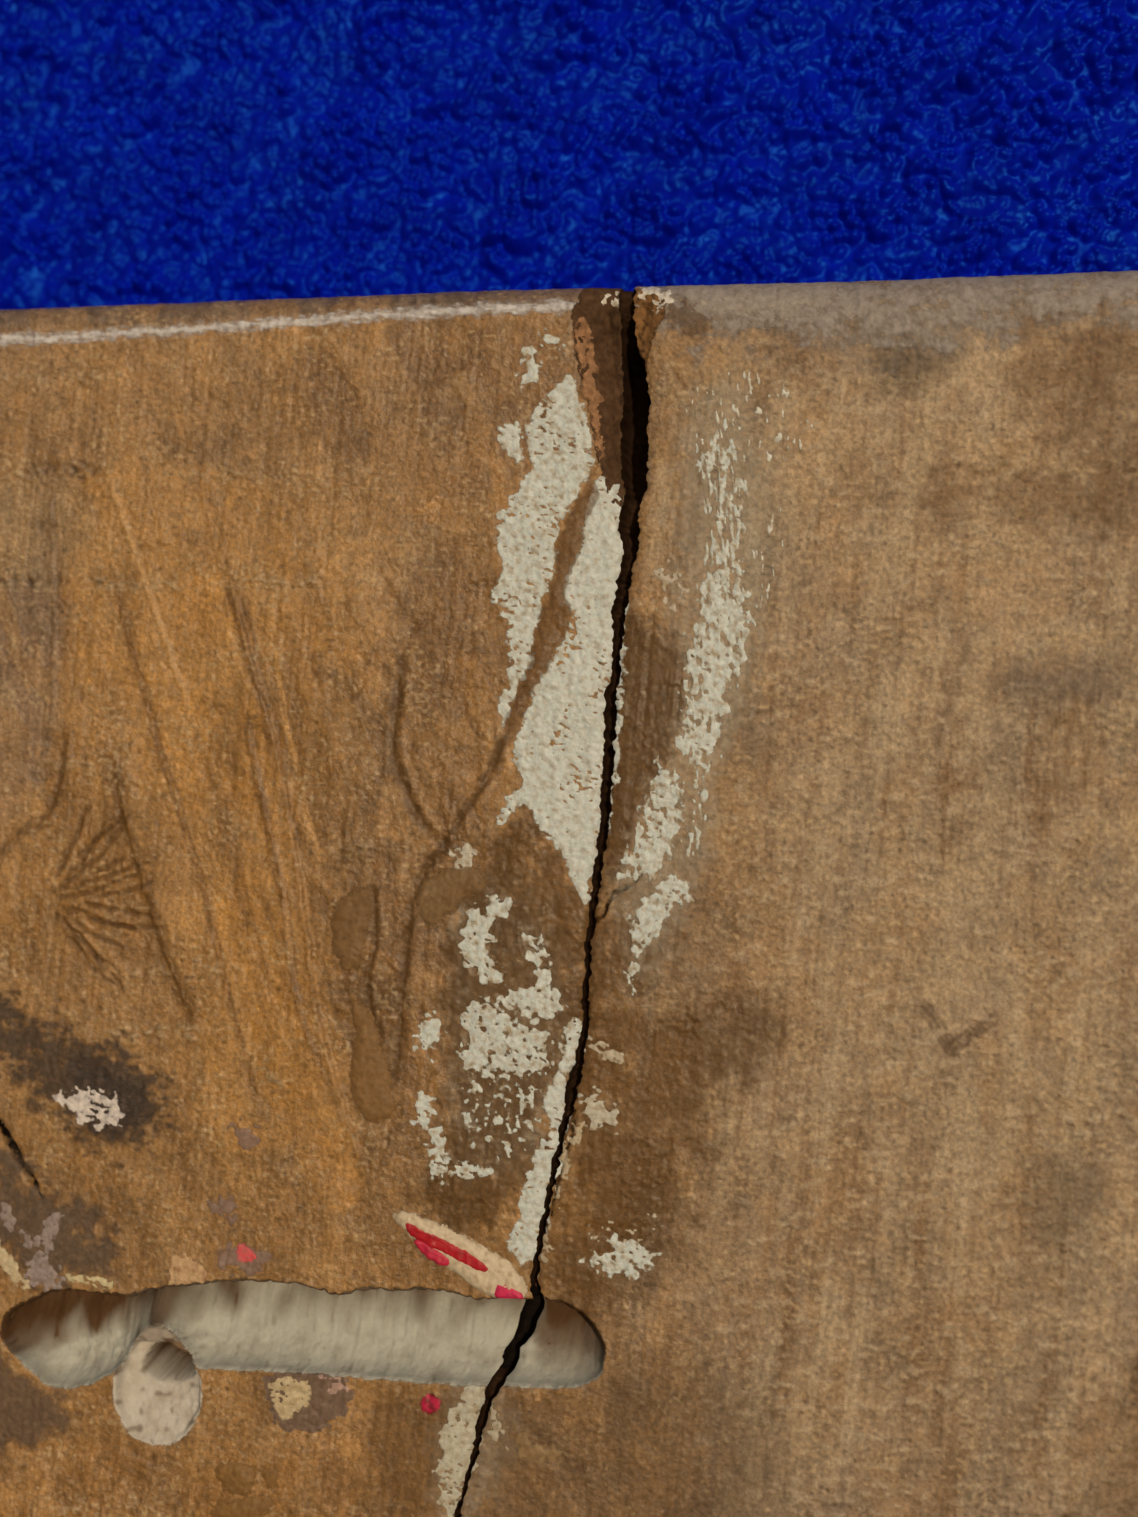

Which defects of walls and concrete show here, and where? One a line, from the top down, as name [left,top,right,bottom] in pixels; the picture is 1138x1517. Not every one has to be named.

crack [0,1119,45,1203]
crack [454,289,650,1517]